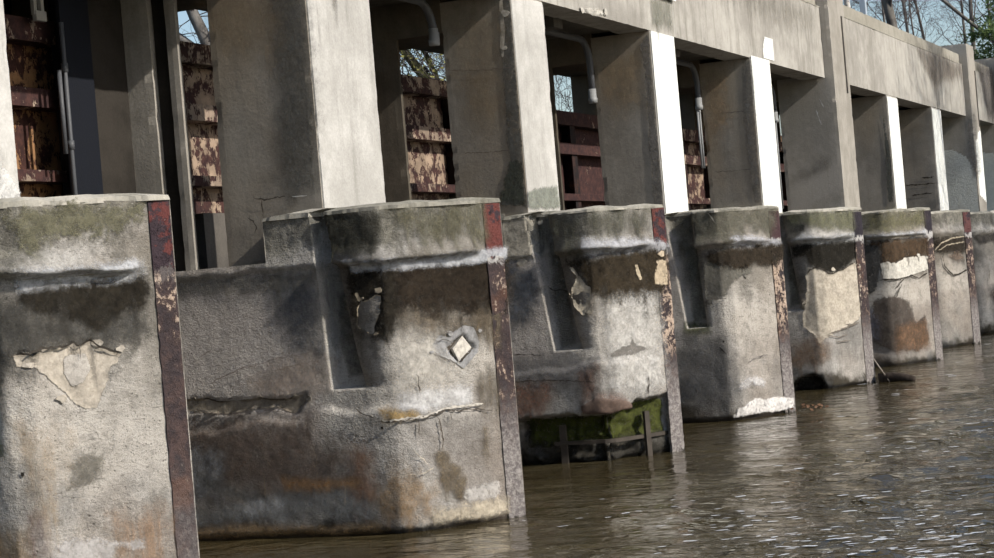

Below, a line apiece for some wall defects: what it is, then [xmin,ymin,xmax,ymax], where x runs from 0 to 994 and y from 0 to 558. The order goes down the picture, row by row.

water stain [0,260,150,397]
peeling [355,287,382,335]
peeling [569,267,593,315]
peeling [801,263,862,344]
water stain [704,224,994,352]
peeling [881,253,928,280]
peeling [14,339,125,409]
crack [194,396,293,415]
spalling [369,403,483,422]
water stain [525,422,667,464]